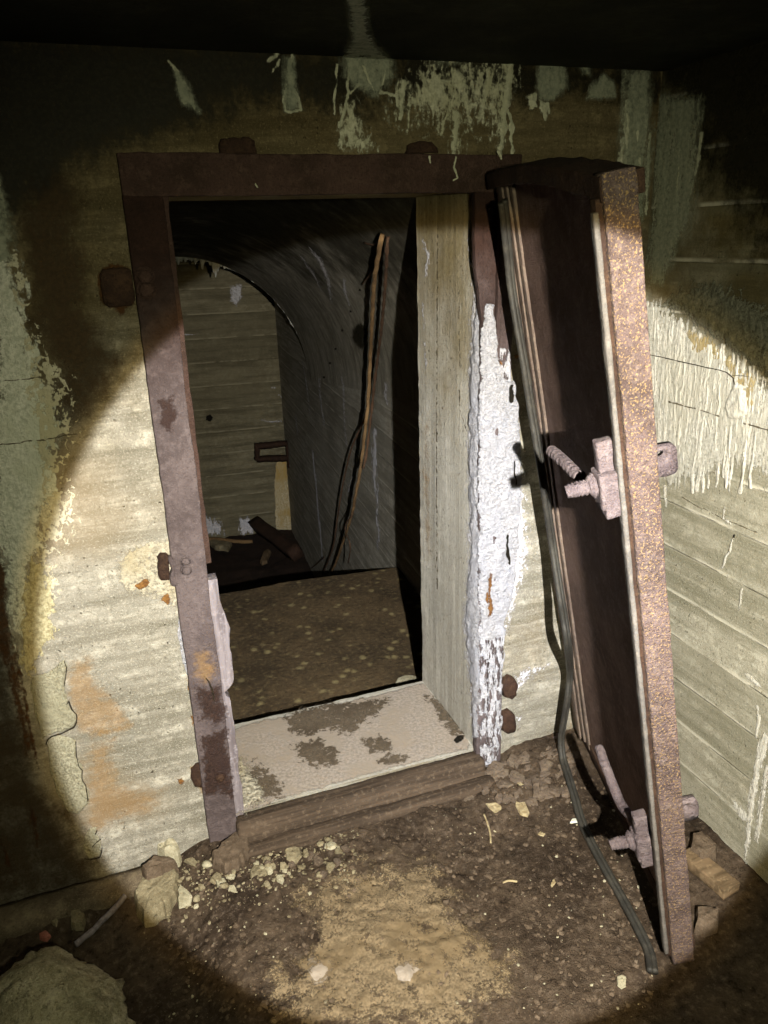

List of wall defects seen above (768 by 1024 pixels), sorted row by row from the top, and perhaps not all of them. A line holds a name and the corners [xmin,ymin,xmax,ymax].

water stain [0,0,768,678]
crack [650,354,749,385]
crack [0,434,77,445]
rust [157,398,176,432]
crack [668,401,768,431]
crack [46,661,88,801]
rust [197,686,234,799]
water stain [283,697,409,769]
water stain [243,758,285,808]
water stain [733,705,768,863]